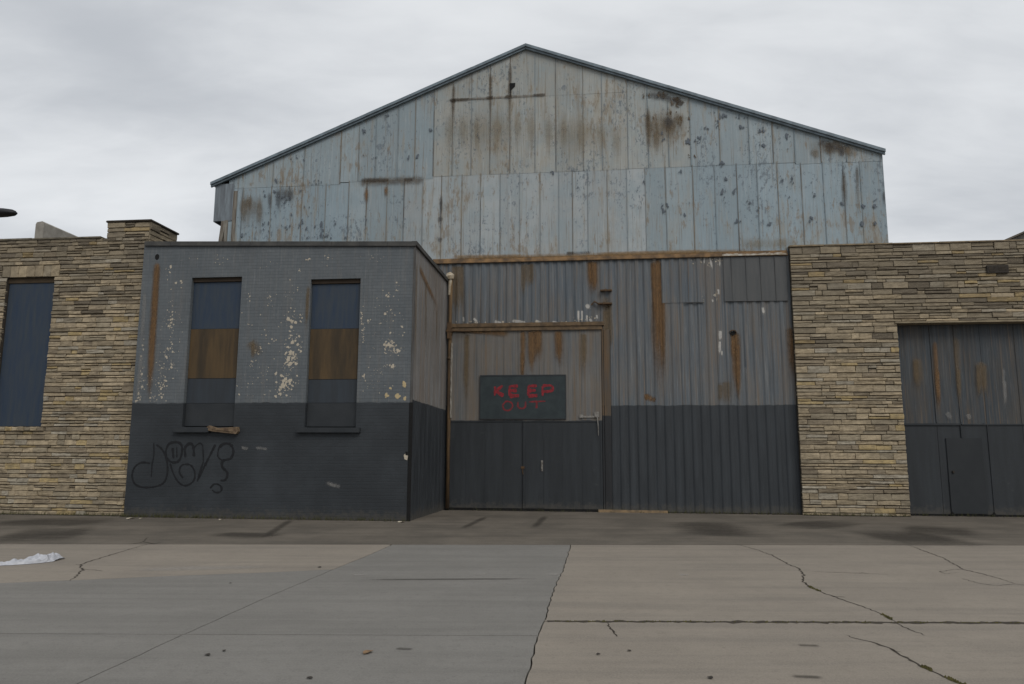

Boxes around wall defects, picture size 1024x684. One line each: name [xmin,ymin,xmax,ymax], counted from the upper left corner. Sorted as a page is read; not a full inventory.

rust [149,264,159,380]
peeling [135,265,183,402]
peeling [237,308,303,398]
peeling [360,282,406,401]
rust [457,250,740,363]
rust [729,330,740,393]
crack [70,538,159,580]
crack [737,544,966,684]